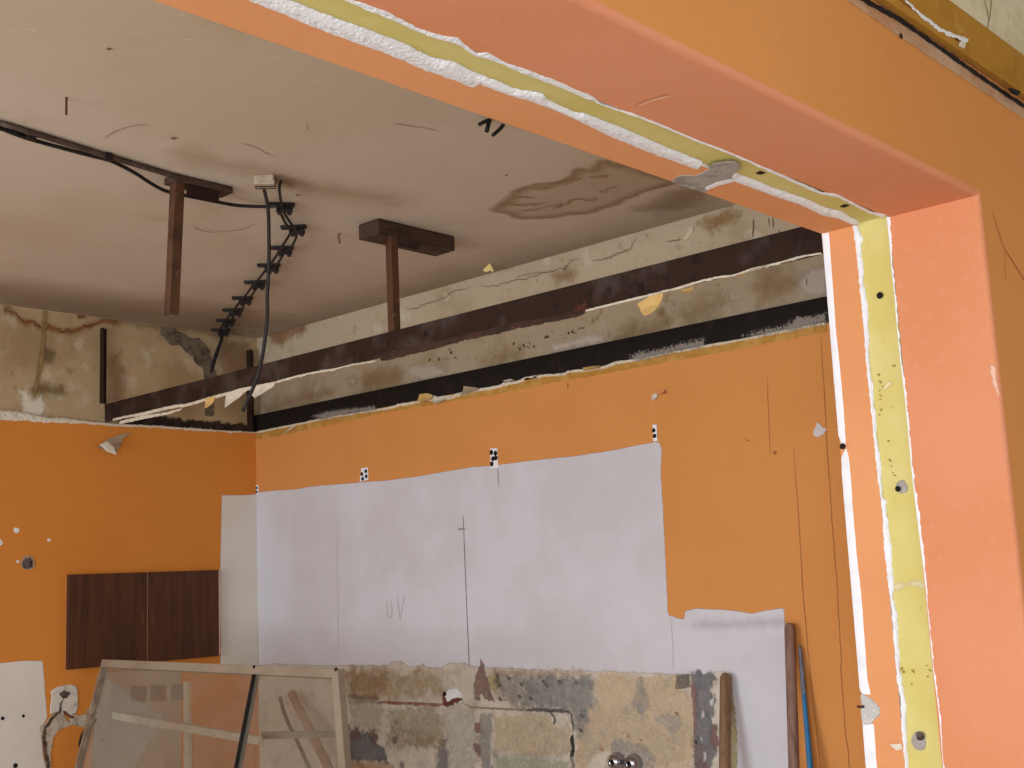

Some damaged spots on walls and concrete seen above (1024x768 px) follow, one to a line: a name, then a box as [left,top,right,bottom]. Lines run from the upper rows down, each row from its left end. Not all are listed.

leakage [495,162,664,218]
crack [404,239,636,310]
corrosion [6,309,116,333]
corrosion [380,301,587,361]
spalling [249,0,945,768]
spalling [42,698,64,768]